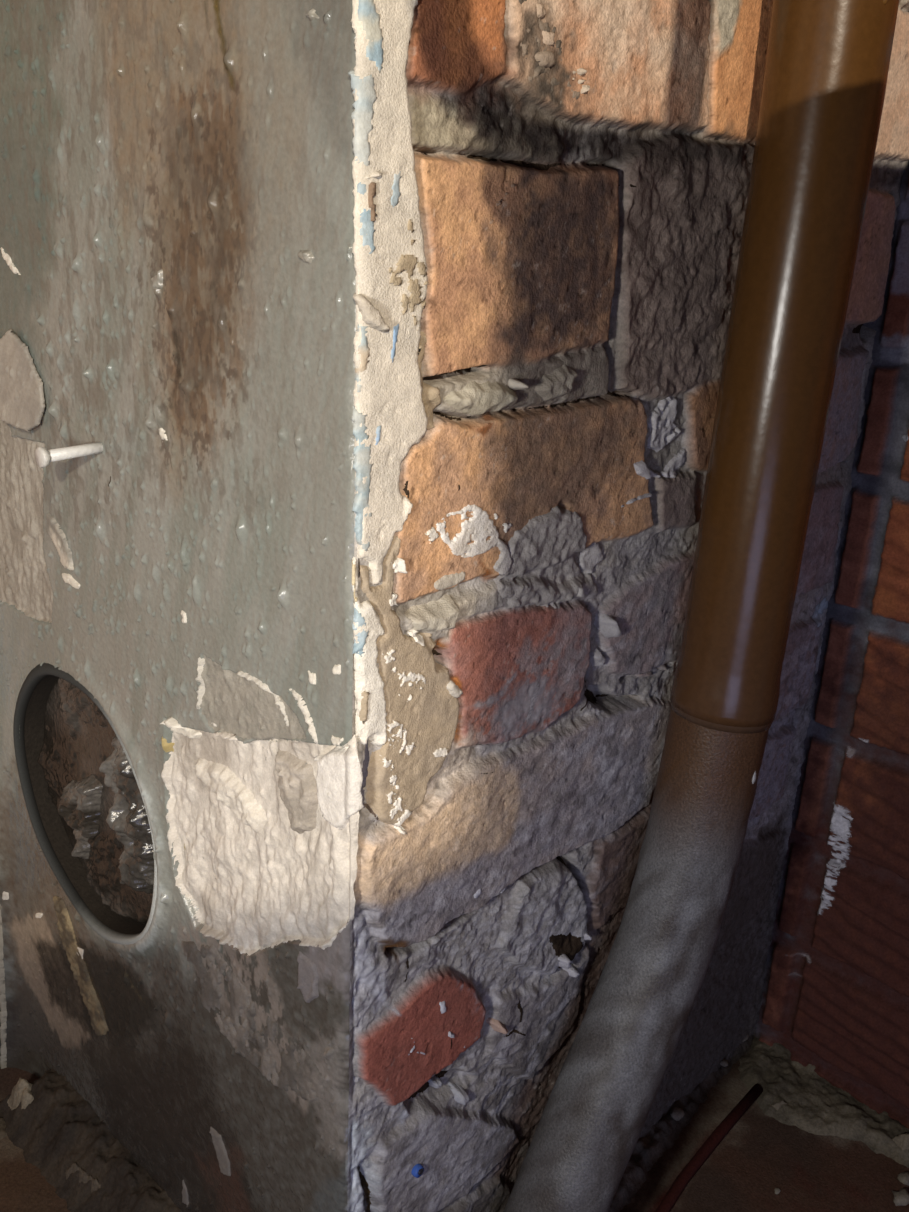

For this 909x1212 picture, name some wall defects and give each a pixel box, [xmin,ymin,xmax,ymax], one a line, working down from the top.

water stain [214,0,233,84]
flaking render [0,329,80,623]
flaking render [160,0,463,1102]